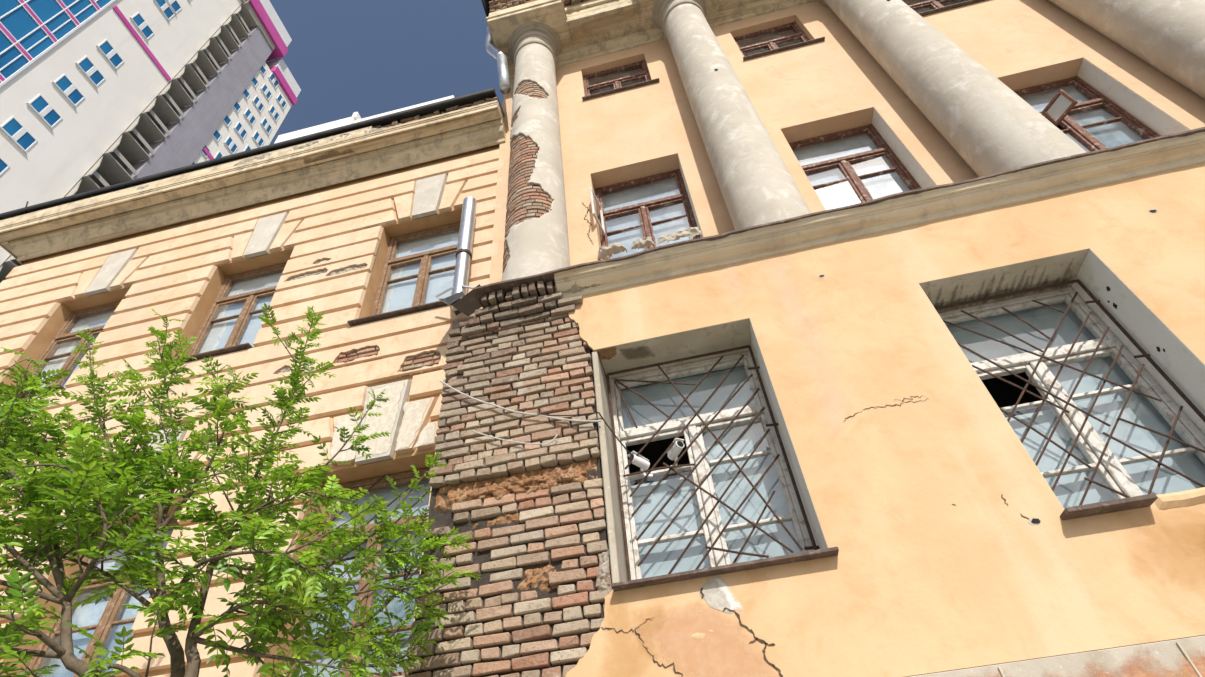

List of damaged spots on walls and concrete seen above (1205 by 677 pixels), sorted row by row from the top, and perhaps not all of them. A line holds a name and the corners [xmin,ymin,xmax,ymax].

spalling [516,81,548,99]
spalling [234,153,271,166]
spalling [290,97,553,273]
spalling [288,259,367,281]
crack [843,396,930,422]
flaking render [330,314,649,677]
peeling [700,577,733,613]
crack [601,617,683,677]
crack [700,588,783,677]